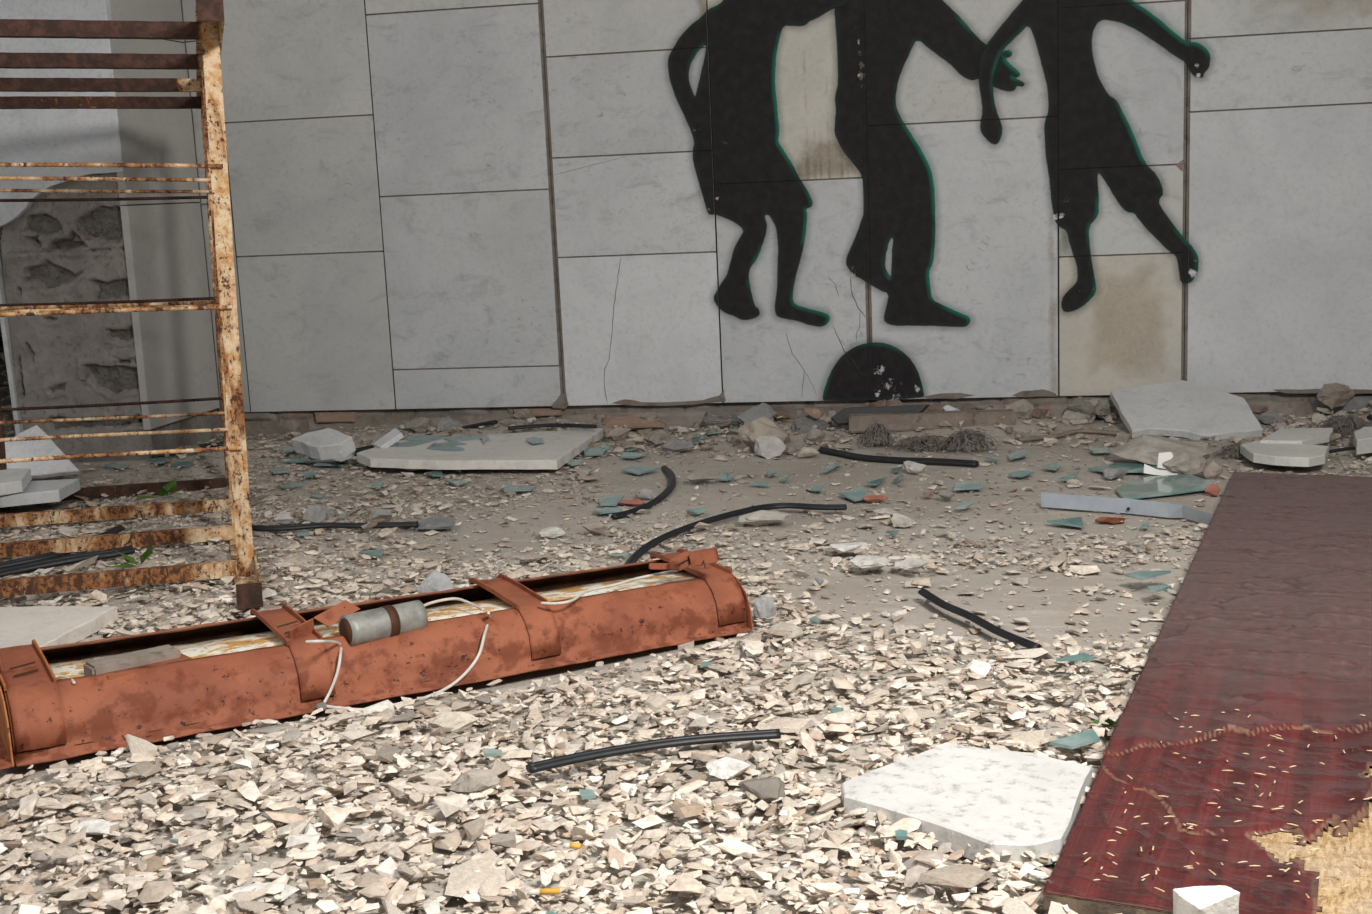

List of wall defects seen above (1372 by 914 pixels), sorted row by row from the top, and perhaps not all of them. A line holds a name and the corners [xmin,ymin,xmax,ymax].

spalling [0,162,242,464]
crack [604,259,621,404]
spalling [244,409,385,434]
spalling [431,390,726,428]
spalling [738,400,869,418]
spalling [900,389,1120,419]
spalling [1230,389,1372,415]